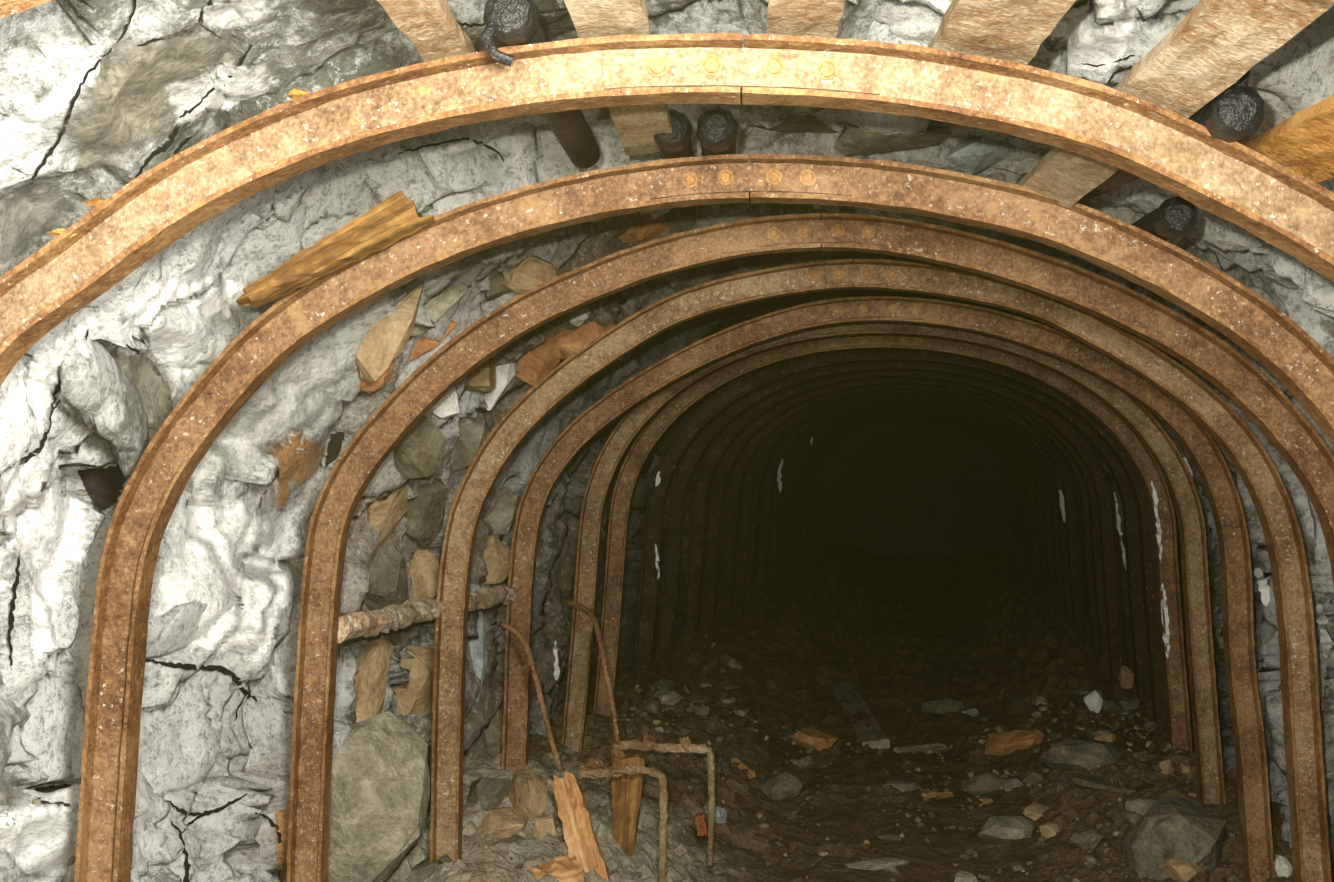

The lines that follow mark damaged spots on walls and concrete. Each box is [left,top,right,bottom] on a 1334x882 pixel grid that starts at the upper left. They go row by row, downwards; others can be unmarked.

crack [32,0,253,183]
rust [1321,307,1334,337]
crack [0,379,61,477]
rust [265,429,326,511]
crack [0,544,20,666]
crack [146,659,258,720]
crack [167,793,283,882]
rust [275,809,289,882]